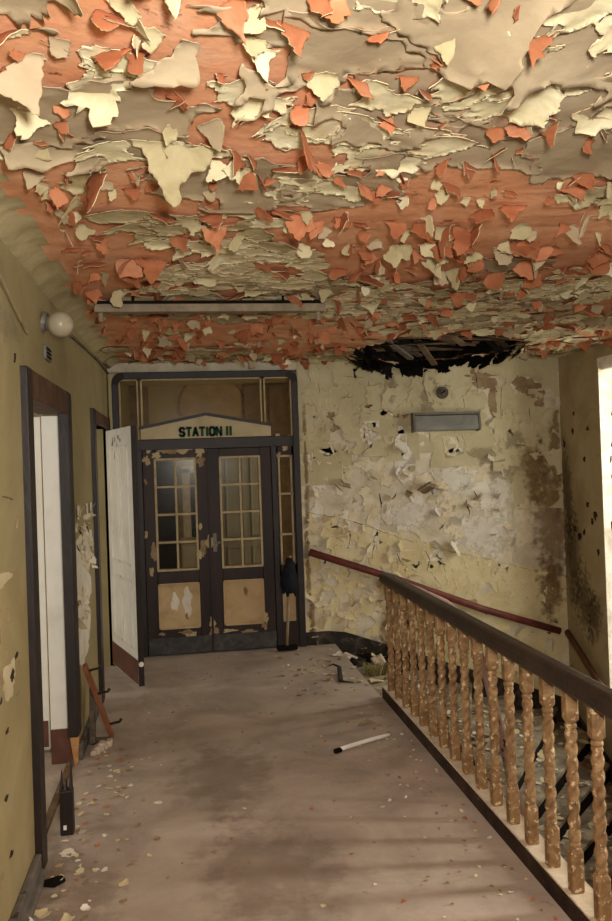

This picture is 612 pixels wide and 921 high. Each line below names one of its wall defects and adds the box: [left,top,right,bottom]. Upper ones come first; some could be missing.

peeling [0,0,612,670]
leakage [523,441,565,622]
spalling [0,652,20,705]